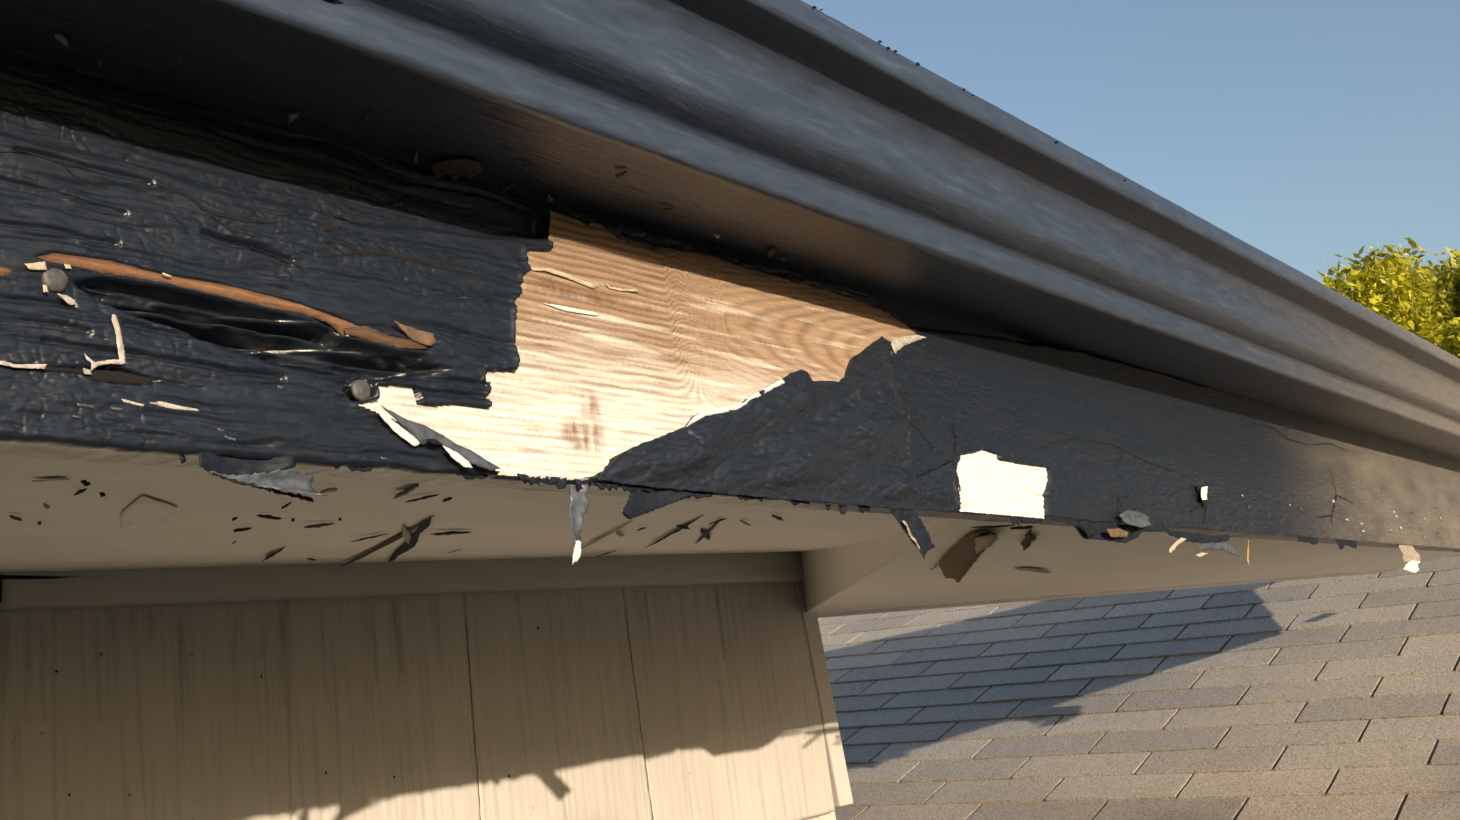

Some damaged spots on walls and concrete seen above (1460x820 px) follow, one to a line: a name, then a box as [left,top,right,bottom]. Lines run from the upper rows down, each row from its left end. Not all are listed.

spalling [25,261,76,305]
spalling [72,399,199,419]
peeling [358,194,926,565]
peeling [179,428,341,544]
peeling [335,457,388,472]
peeling [339,484,471,567]
peeling [889,450,1250,583]
crack [1034,437,1208,526]
crack [1252,422,1352,532]
peeling [1298,519,1365,550]